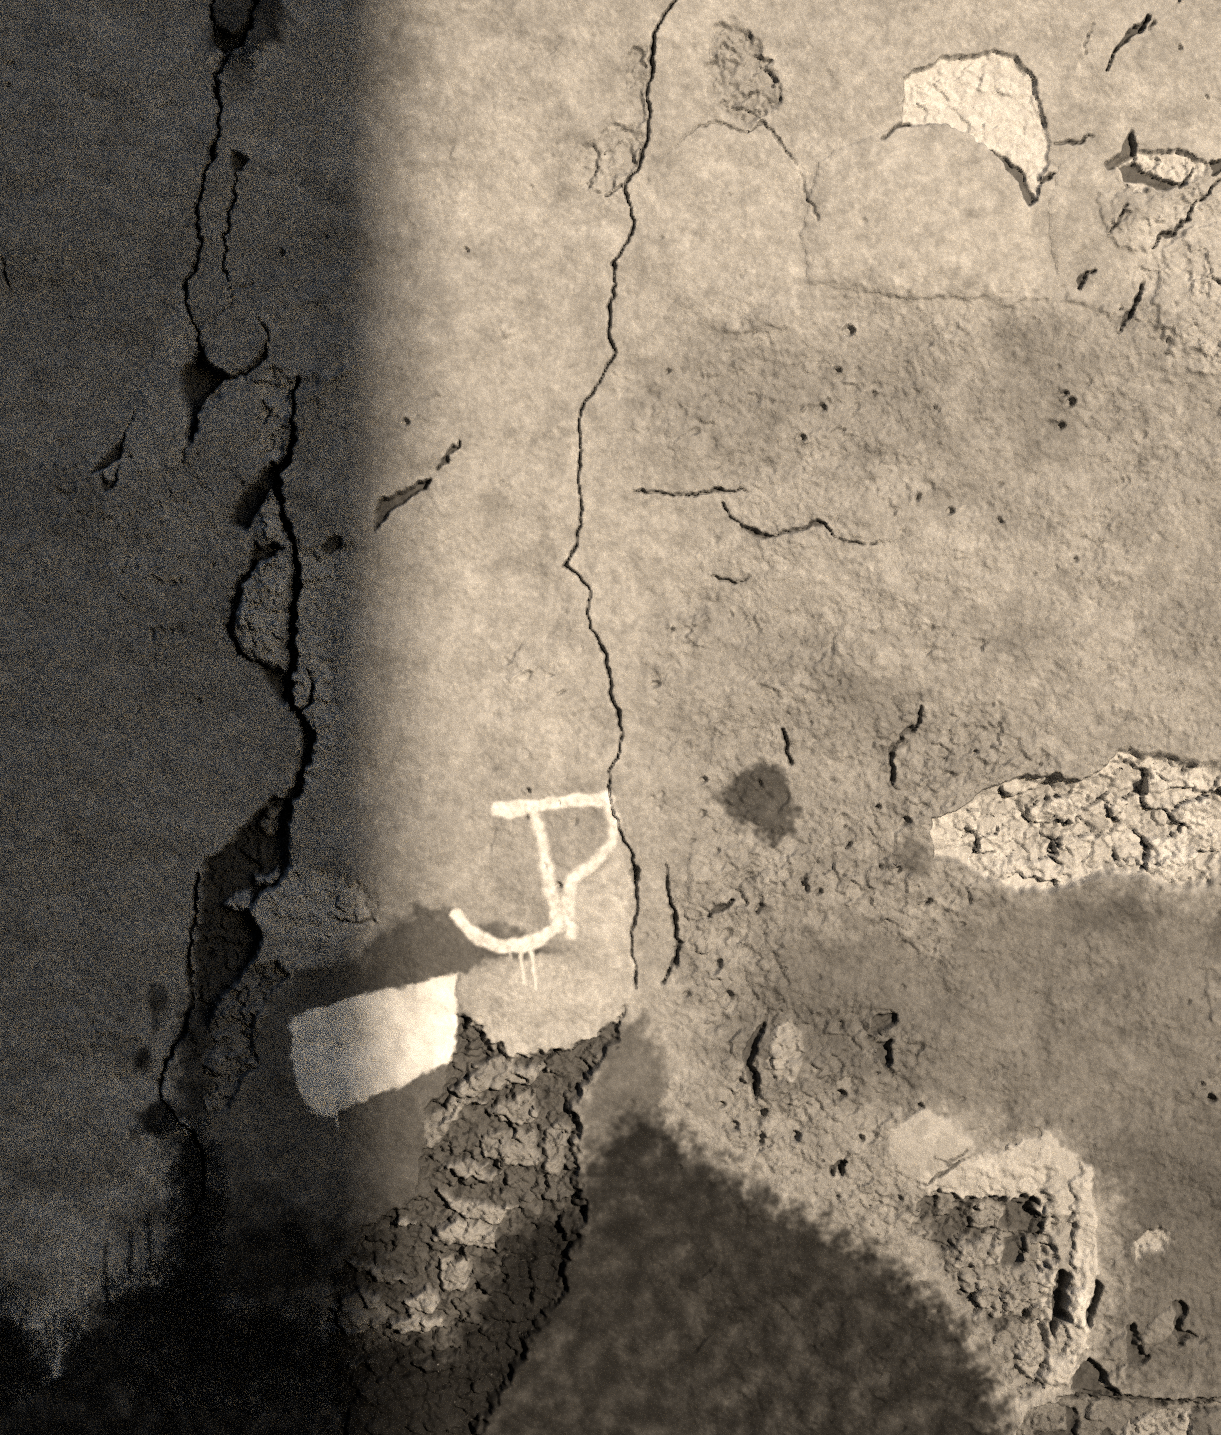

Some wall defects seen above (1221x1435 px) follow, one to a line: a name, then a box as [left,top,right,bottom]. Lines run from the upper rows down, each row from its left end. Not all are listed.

crack [1084,0,1181,71]
crack [180,0,269,462]
spalling [880,49,1093,206]
spalling [1104,132,1210,194]
crack [223,376,316,801]
crack [562,0,735,989]
crack [633,487,866,546]
spalling [156,536,382,1223]
spalling [929,745,1221,897]
crack [870,1013,896,1068]
crack [830,1160,846,1178]
peeling [887,1105,1196,1400]